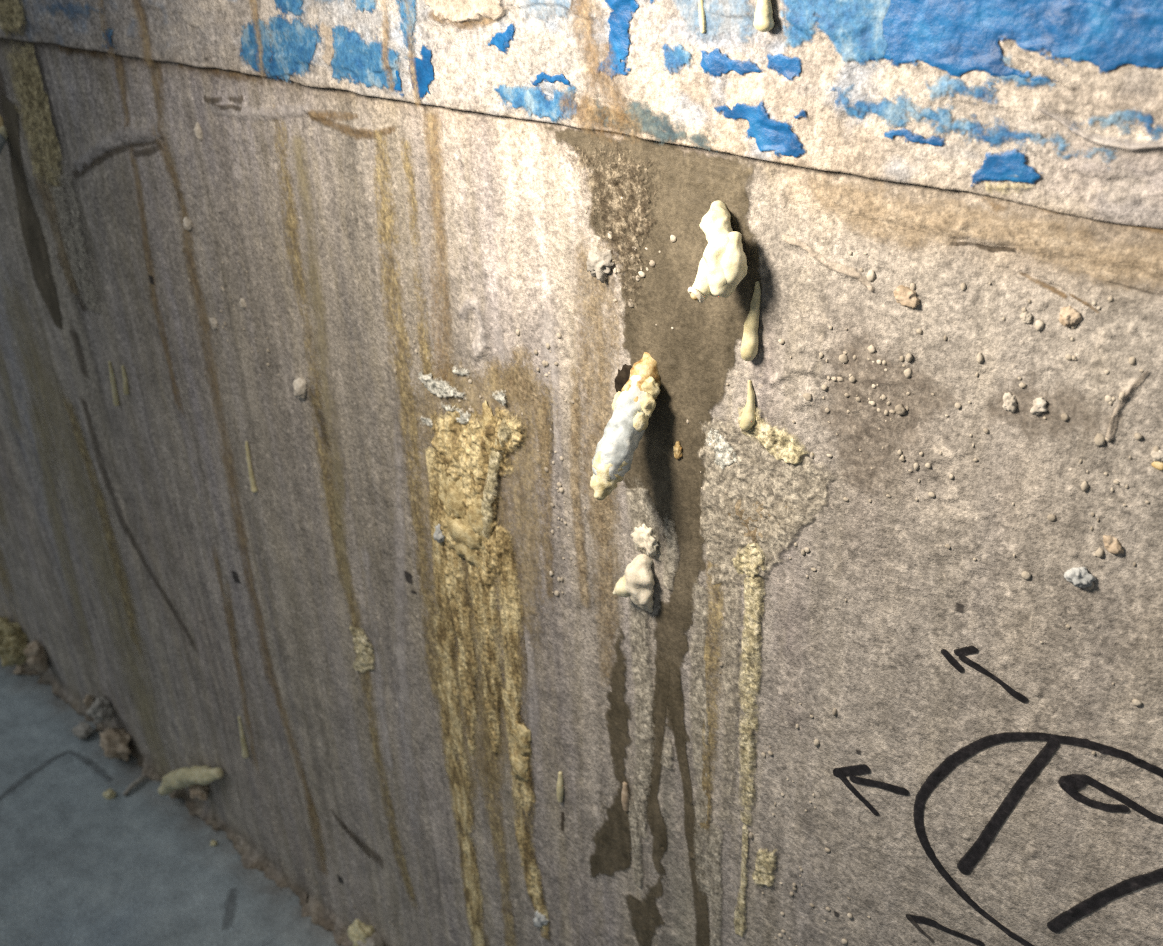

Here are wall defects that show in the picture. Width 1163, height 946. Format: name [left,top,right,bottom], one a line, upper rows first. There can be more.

peeling [240,0,515,101]
peeling [494,72,577,122]
peeling [521,0,571,19]
peeling [598,0,653,80]
peeling [590,102,710,150]
peeling [662,0,1163,288]
water stain [0,73,86,328]
water stain [490,127,761,946]